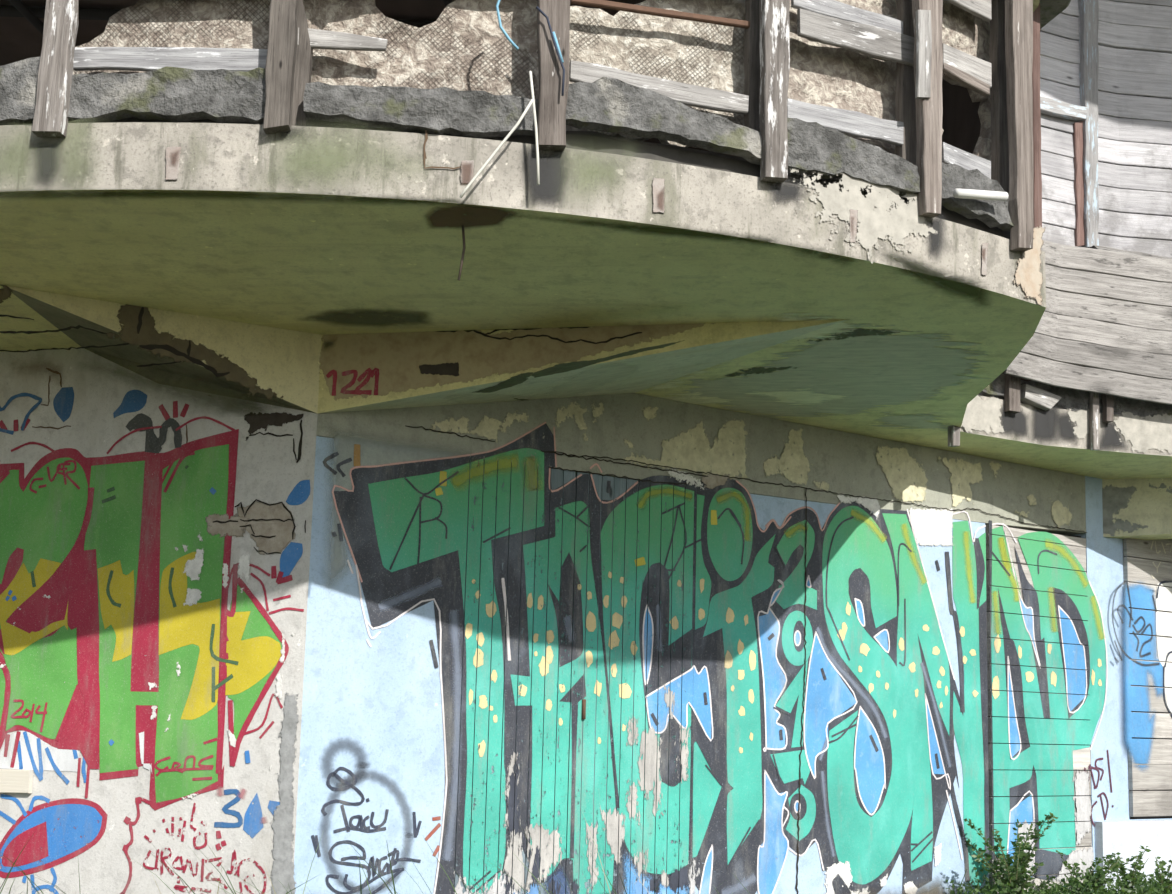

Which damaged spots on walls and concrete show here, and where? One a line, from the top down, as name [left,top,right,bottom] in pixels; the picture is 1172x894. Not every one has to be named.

spalling [0,285,13,304]
spalling [1013,226,1046,306]
spalling [107,304,304,463]
peeling [623,313,990,519]
spalling [175,499,306,606]
peeling [876,445,1001,546]
peeling [1102,483,1172,536]